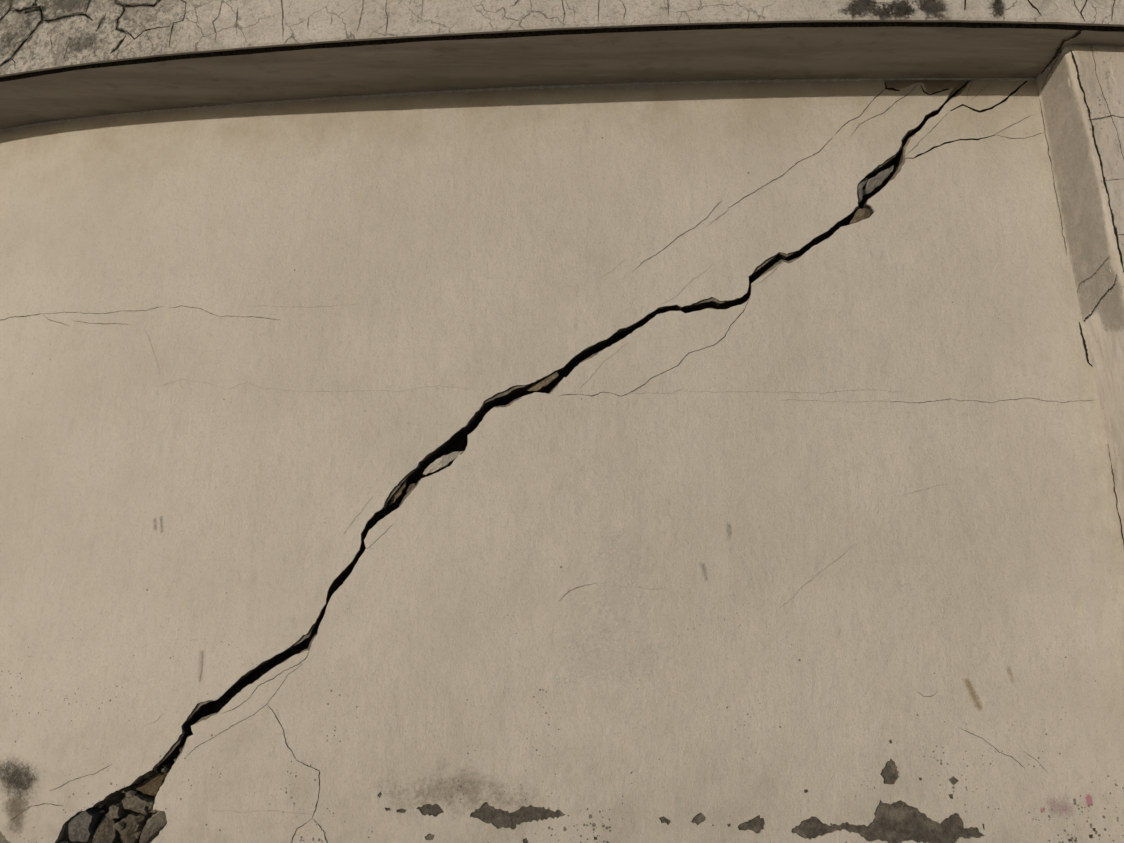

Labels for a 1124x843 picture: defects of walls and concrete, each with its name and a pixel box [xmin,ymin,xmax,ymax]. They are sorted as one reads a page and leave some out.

crack [0,0,187,75]
crack [281,0,388,37]
mould [841,0,946,18]
leakage [992,0,1004,17]
crack [1041,0,1124,367]
crack [1,304,354,387]
crack [152,79,1067,843]
crack [1108,448,1124,545]
spalling [55,765,173,843]
peeling [470,802,566,843]
peeling [791,800,985,843]
peeling [880,758,899,785]